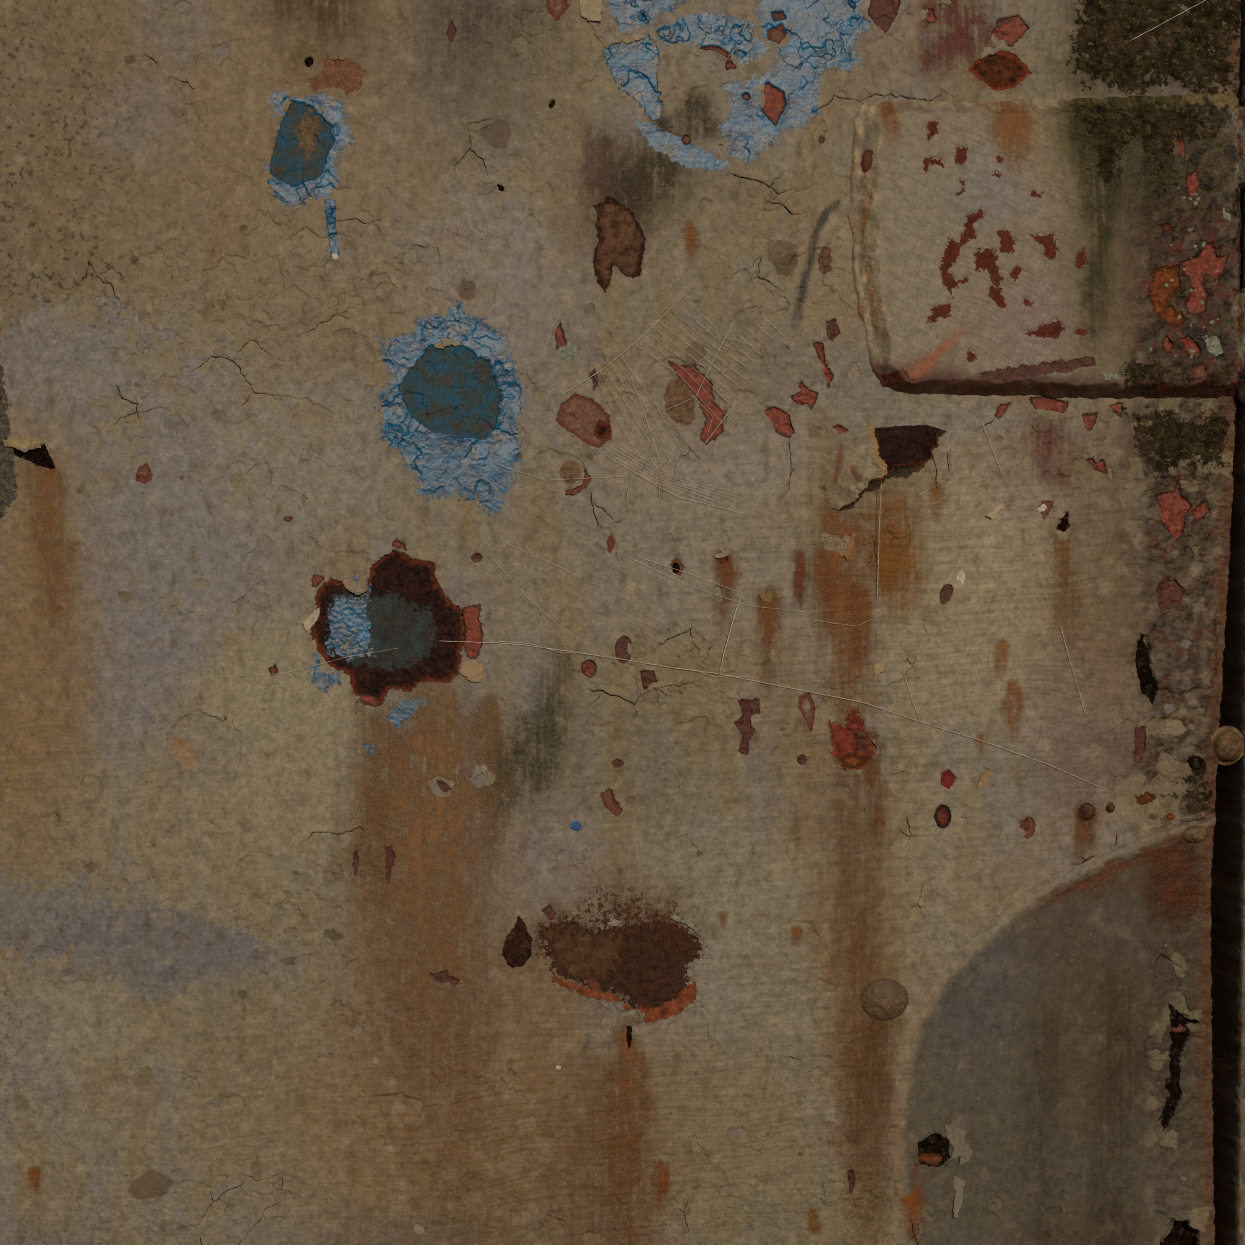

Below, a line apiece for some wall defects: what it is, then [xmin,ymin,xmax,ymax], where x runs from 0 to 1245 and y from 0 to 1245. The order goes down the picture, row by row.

crack [731,173,797,215]
crack [64,261,120,301]
spalling [589,197,646,293]
crack [116,385,162,424]
crack [199,340,291,404]
spalling [303,530,375,580]
peeling [303,608,320,632]
corrosion [794,499,919,689]
peeling [1133,575,1218,764]
corrosion [502,888,711,1197]
peeling [909,1123,973,1218]
crack [194,1173,283,1245]